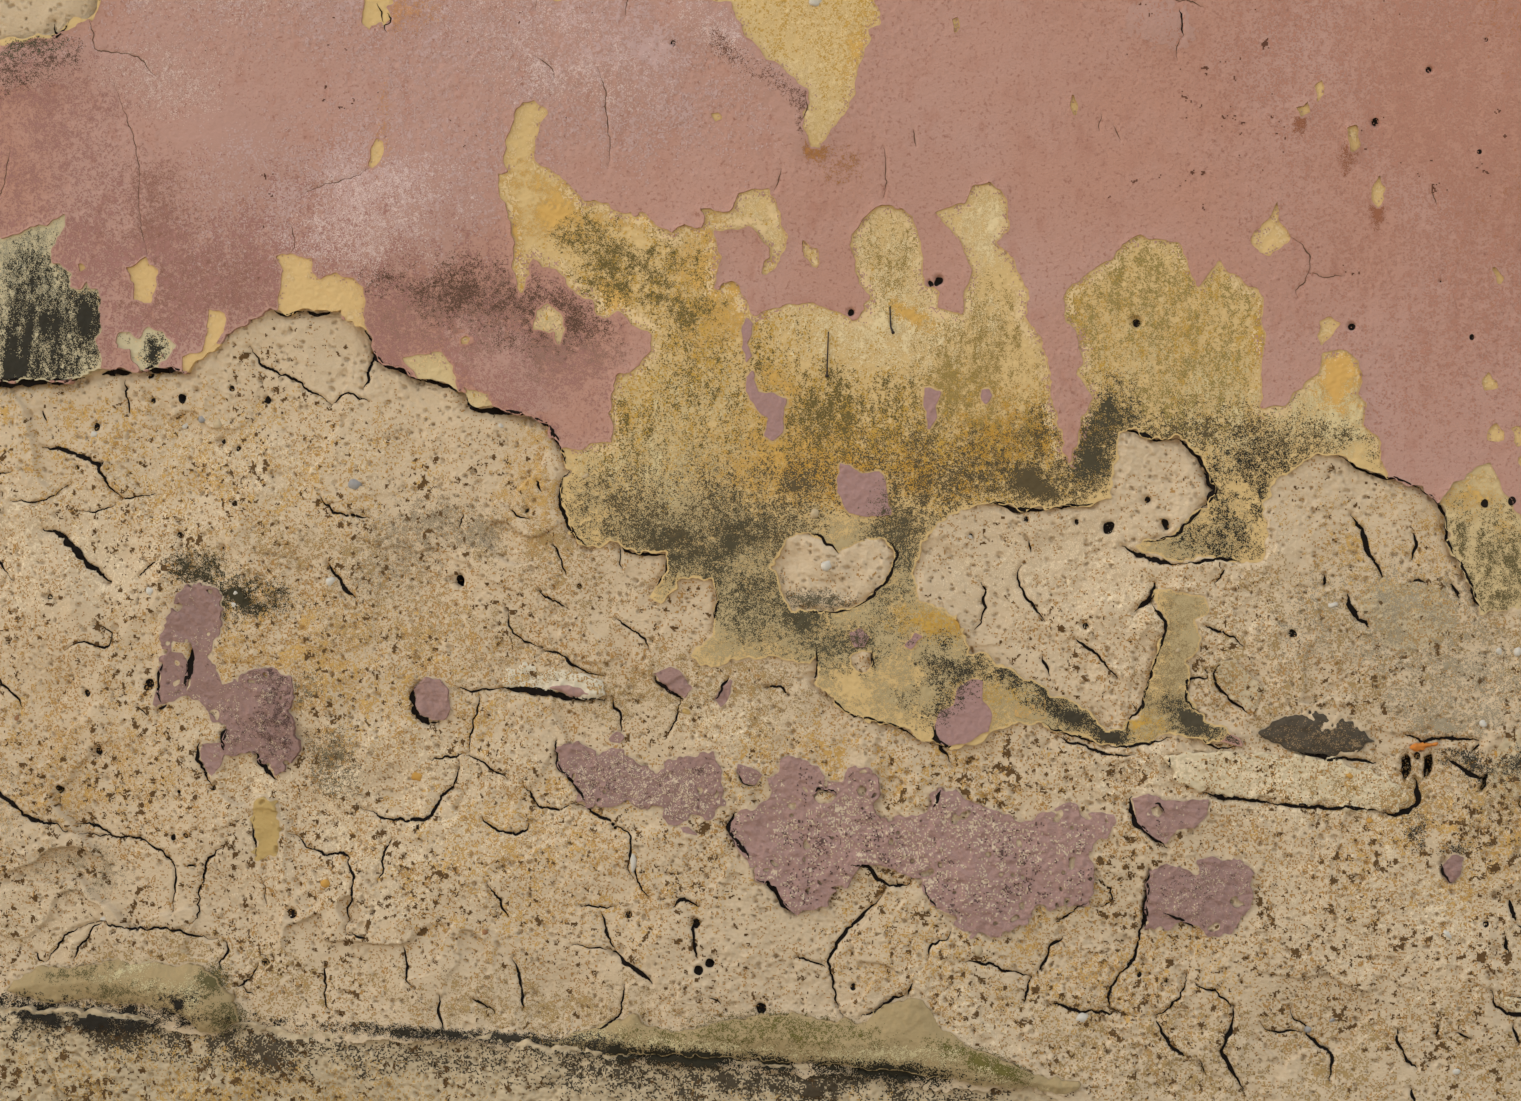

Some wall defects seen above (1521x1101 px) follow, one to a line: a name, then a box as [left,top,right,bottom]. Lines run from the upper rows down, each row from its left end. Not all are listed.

flaking render [0,0,101,46]
peeling [362,0,393,30]
peeling [713,0,881,148]
peeling [0,214,102,383]
crack [0,366,184,389]
peeling [498,100,1343,652]
crack [365,330,667,585]
crack [988,501,1095,513]
crack [1127,430,1218,542]
crack [1338,455,1485,612]
flaking render [0,253,1521,1101]
crack [1045,604,1239,750]